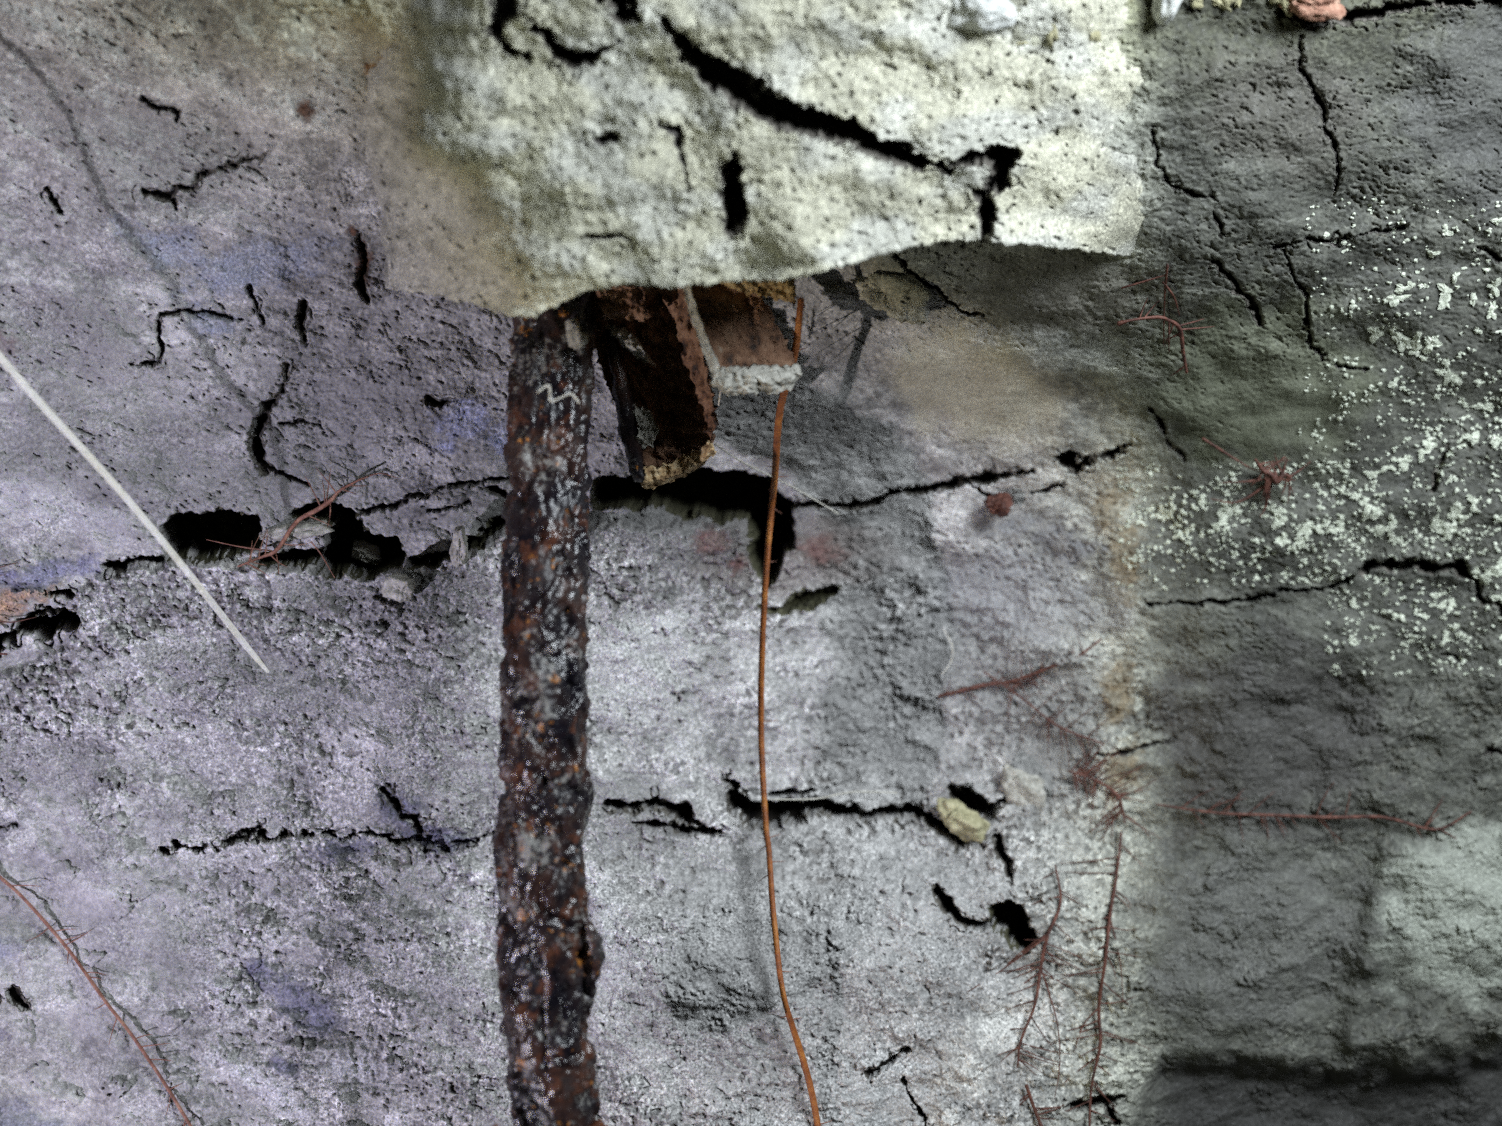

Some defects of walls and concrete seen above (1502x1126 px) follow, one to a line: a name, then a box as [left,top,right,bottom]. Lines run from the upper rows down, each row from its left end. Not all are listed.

crack [482,0,1025,243]
crack [1276,0,1501,193]
crack [1150,126,1408,373]
rust [596,284,652,323]
crack [356,476,510,515]
crack [789,407,1187,517]
crack [0,555,164,657]
rust [584,764,595,829]
crack [602,769,1017,932]
rust [538,902,552,925]
rust [537,946,562,1041]
rust [581,917,606,1008]